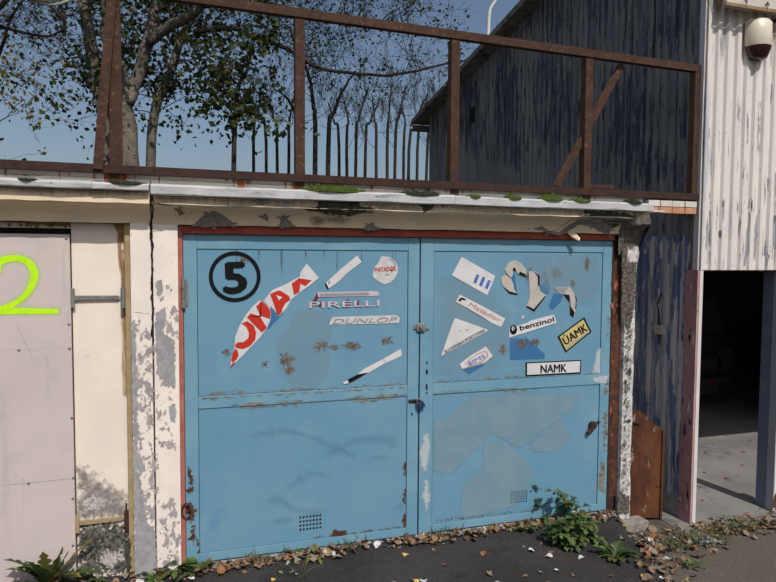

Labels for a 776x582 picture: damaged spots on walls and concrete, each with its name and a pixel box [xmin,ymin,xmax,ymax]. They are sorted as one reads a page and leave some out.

crack [133,195,183,343]
spalling [191,211,238,229]
spalling [528,214,634,240]
peeling [700,194,725,265]
peeling [737,173,776,268]
peeling [611,221,700,511]
water stain [75,466,132,579]
peeling [131,280,182,578]
corrosion [186,466,200,553]
corrosion [629,406,665,520]